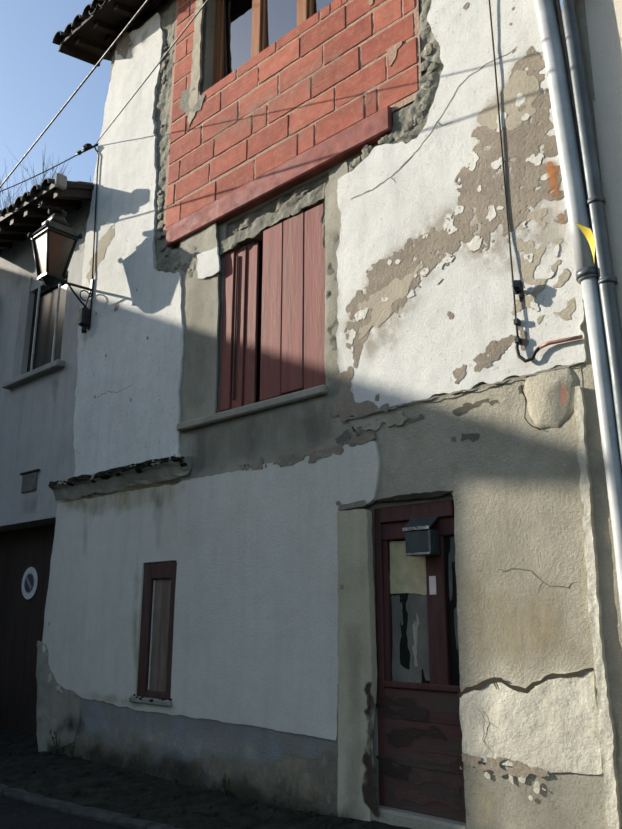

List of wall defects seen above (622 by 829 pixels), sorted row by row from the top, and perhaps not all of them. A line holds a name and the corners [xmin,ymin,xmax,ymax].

flaking render [154,1,221,279]
flaking render [349,0,444,168]
crack [351,47,516,199]
peeling [239,46,575,470]
spalling [336,500,366,510]
crack [479,568,576,590]
flaking render [376,753,549,801]
crack [458,668,594,754]